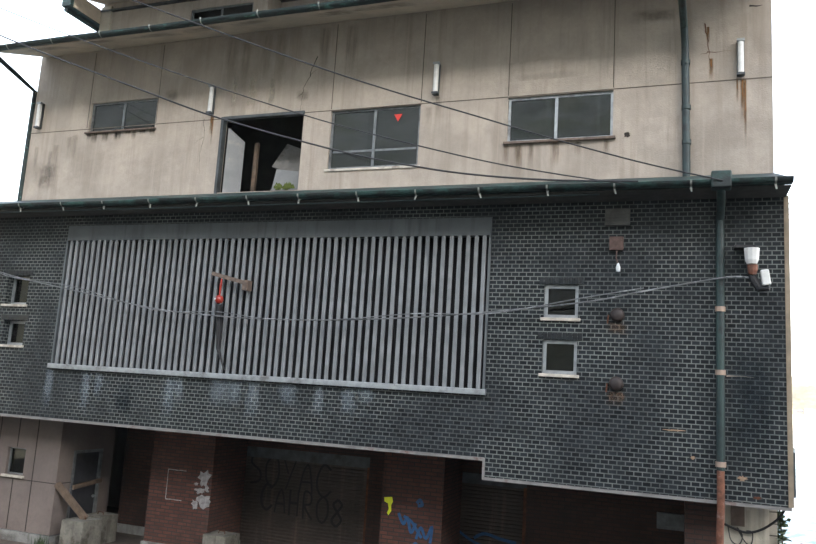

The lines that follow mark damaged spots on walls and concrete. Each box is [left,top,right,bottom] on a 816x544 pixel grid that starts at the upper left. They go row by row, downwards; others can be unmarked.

corrosion [736,79,746,123]
peeling [191,470,212,509]